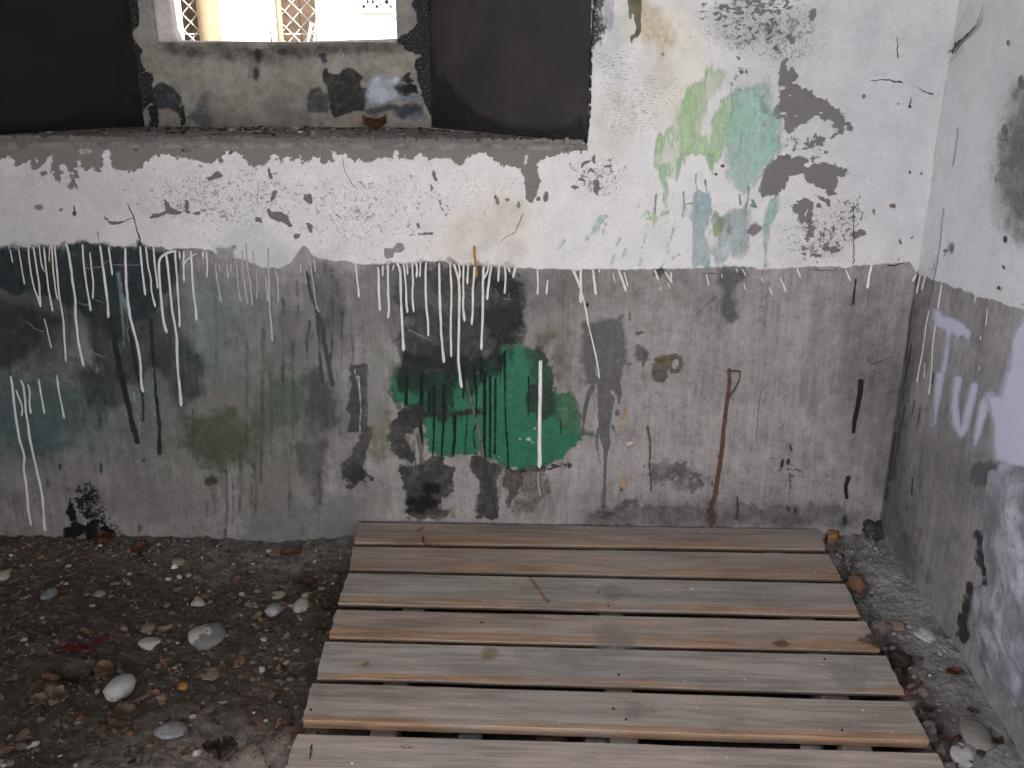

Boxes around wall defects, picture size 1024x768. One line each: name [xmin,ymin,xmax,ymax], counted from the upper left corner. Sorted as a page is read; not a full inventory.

peeling [0,0,612,239]
peeling [217,245,236,264]